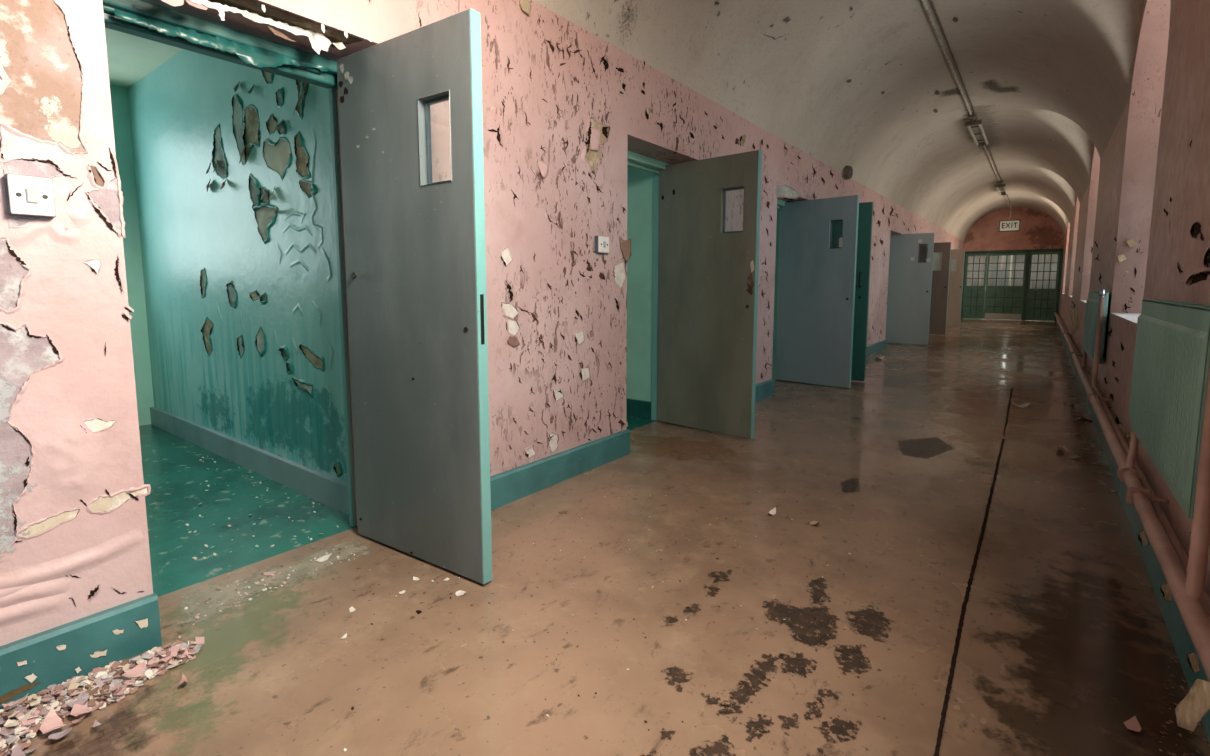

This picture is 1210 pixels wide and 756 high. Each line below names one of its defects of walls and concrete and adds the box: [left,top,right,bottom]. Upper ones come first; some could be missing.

peeling [161,0,208,10]
peeling [0,0,126,238]
peeling [114,9,353,244]
peeling [200,268,208,299]
peeling [226,281,268,309]
crack [1078,237,1117,284]
crack [1164,197,1210,287]
peeling [0,216,151,553]
peeling [237,326,325,398]
crack [1103,268,1137,425]
spalling [15,658,40,685]
spalling [74,617,149,674]